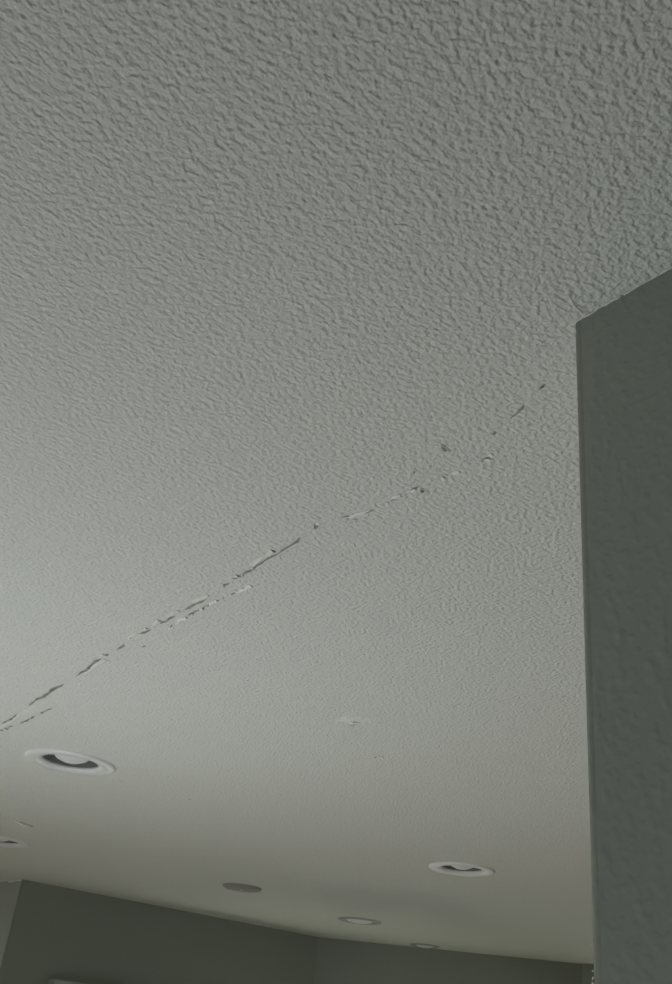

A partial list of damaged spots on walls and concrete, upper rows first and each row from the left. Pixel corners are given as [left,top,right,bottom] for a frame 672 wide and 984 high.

crack [481,385,545,463]
crack [0,471,460,731]